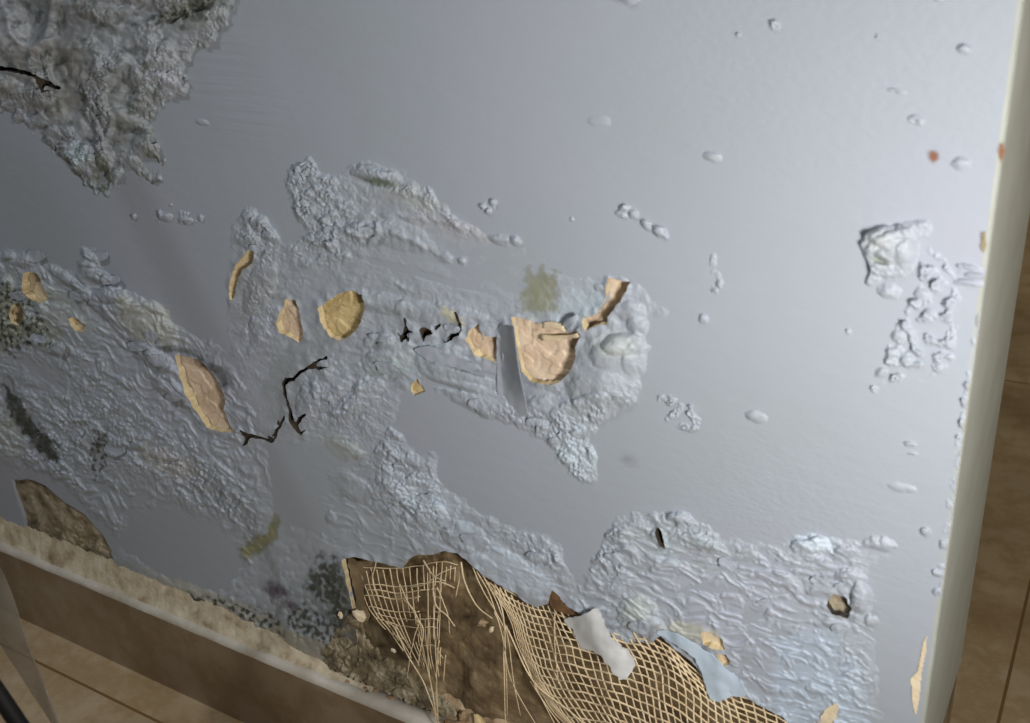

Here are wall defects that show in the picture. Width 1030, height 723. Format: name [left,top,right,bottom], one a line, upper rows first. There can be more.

crack [285,356,327,384]
crack [243,414,306,445]
peeling [0,246,788,723]
spalling [820,703,839,723]